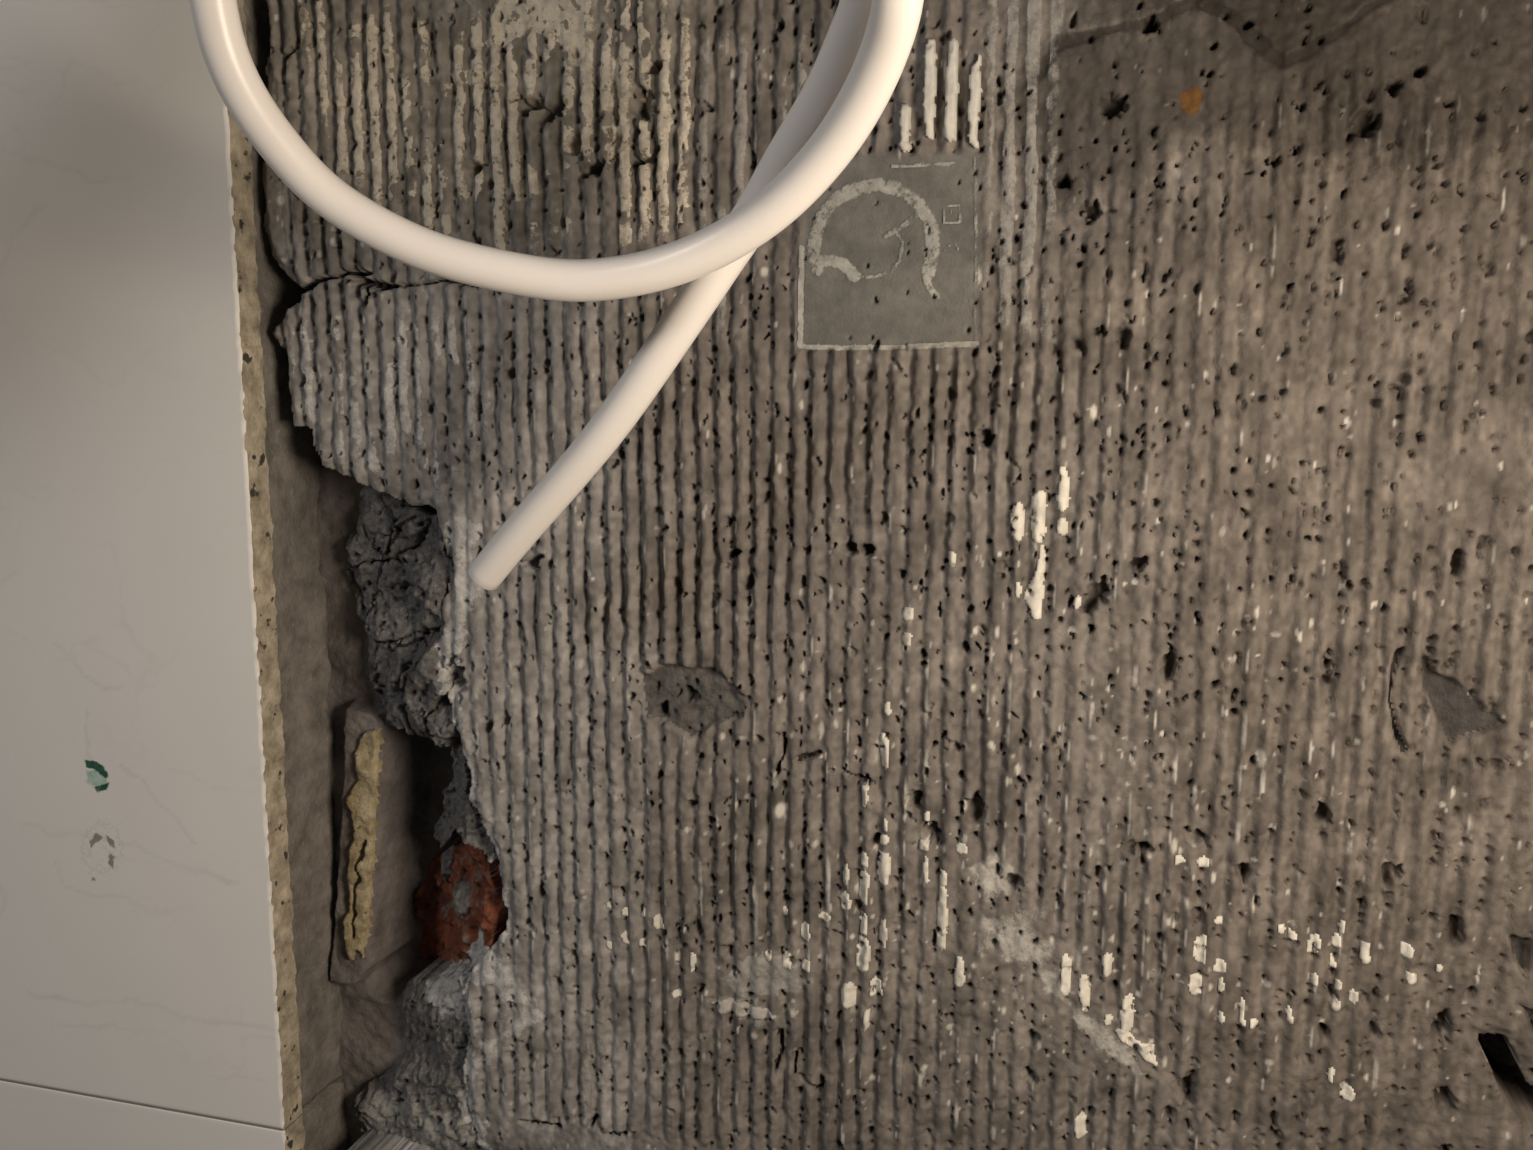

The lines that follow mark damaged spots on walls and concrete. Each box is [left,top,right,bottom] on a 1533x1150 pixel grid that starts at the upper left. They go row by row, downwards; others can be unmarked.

crack [305,272,475,304]
spalling [342,485,508,1150]
spalling [1479,1033,1533,1095]